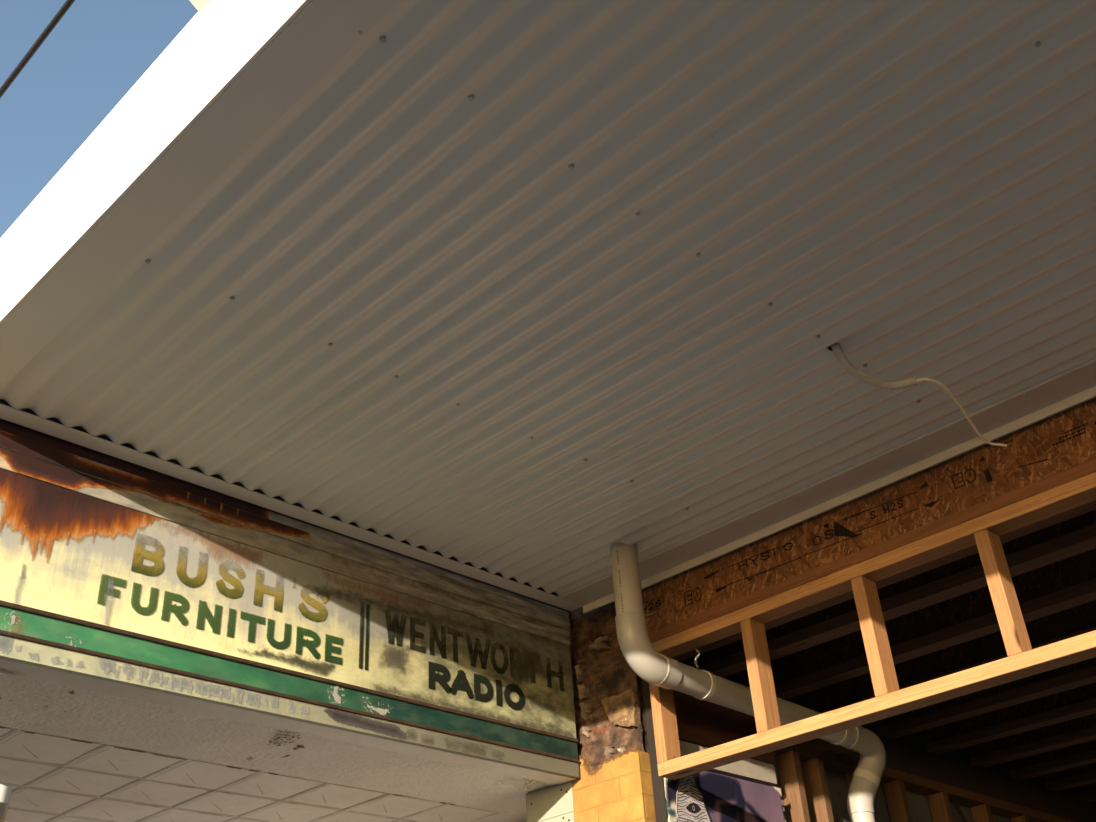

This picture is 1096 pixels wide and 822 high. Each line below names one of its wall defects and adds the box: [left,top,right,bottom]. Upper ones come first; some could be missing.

rust [0,420,310,563]
peeling [327,686,344,704]
peeling [362,697,393,715]